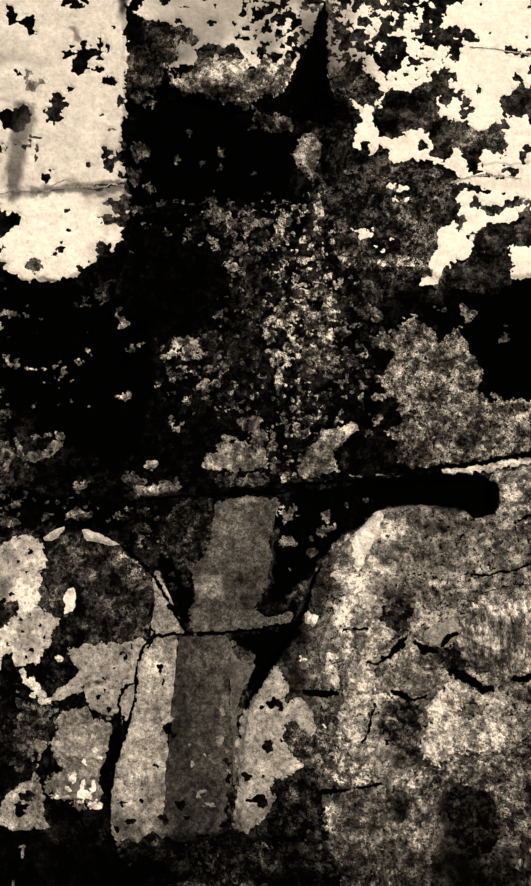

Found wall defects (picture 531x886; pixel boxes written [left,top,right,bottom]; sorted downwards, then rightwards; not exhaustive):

crack [0,178,124,194]
peeling [0,0,531,483]
peeling [106,498,215,585]
peeling [304,611,318,627]
peeling [230,640,255,667]
spalling [0,532,155,831]
crack [107,545,321,808]
crack [303,689,339,698]
peeling [163,716,177,739]
crack [320,782,382,795]